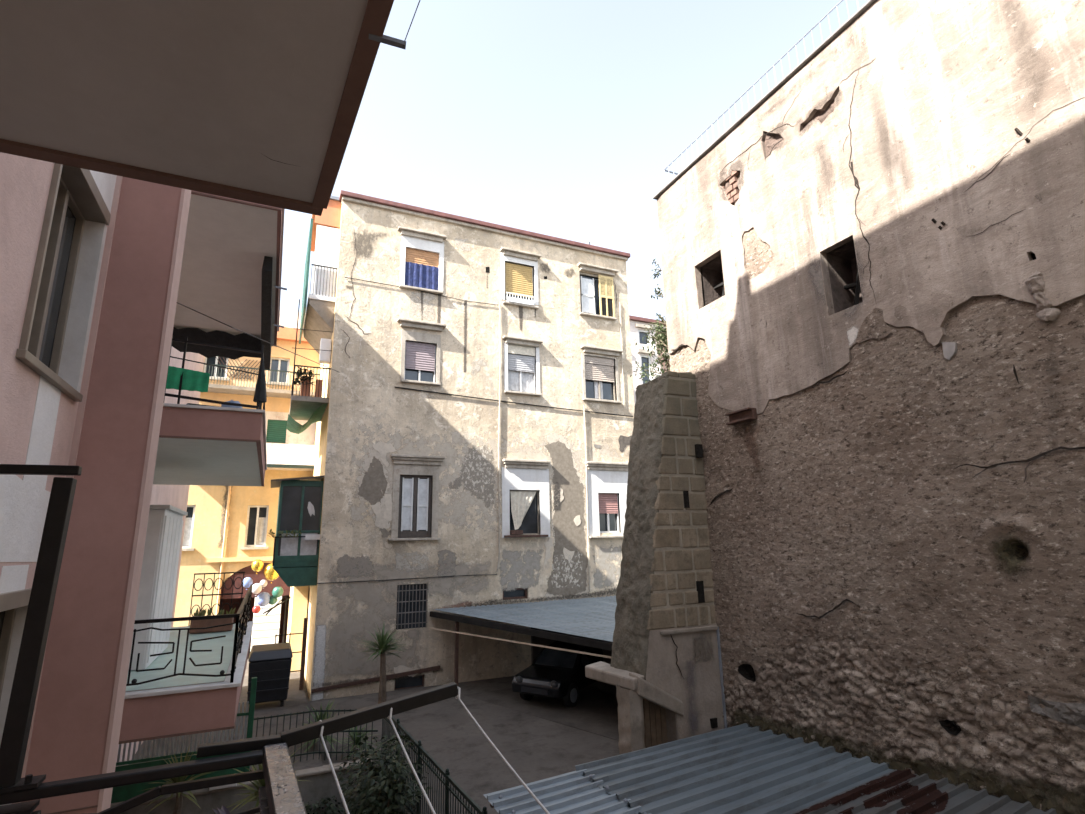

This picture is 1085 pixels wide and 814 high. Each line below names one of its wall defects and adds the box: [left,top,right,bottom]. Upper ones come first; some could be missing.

spalling [803,100,835,130]
crack [963,97,1085,193]
spalling [722,170,740,206]
crack [841,61,876,301]
spalling [743,228,775,279]
spalling [856,305,907,343]
crack [955,446,1085,482]
spalling [348,424,632,601]
rust [795,768,949,814]